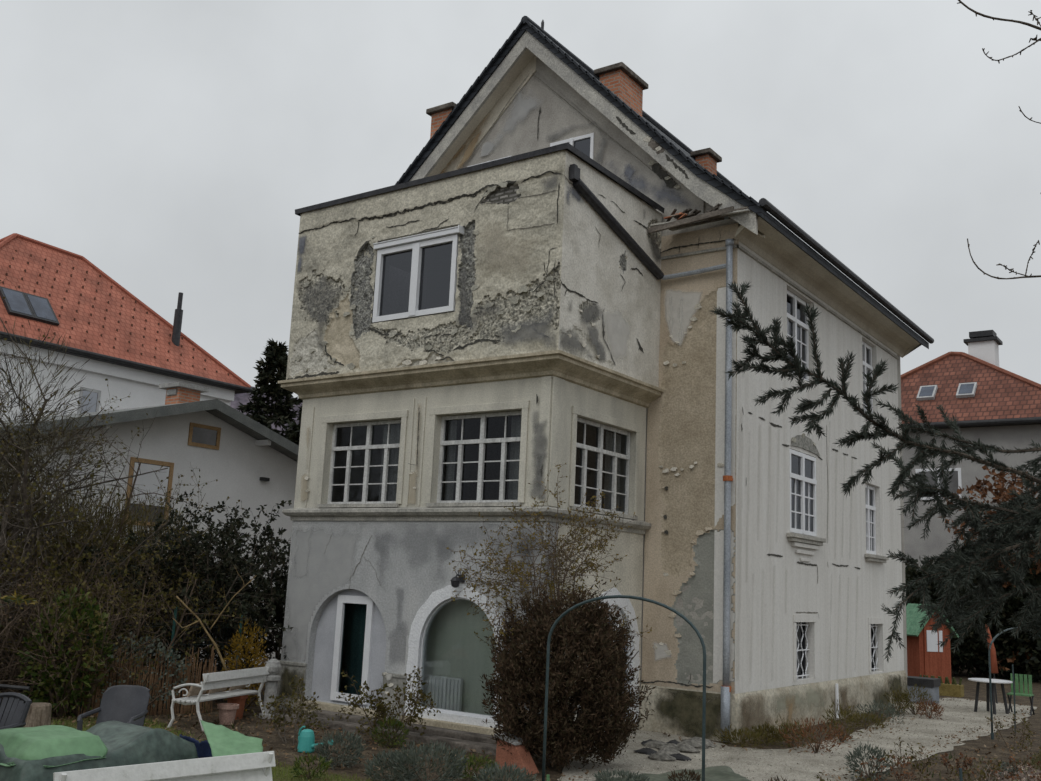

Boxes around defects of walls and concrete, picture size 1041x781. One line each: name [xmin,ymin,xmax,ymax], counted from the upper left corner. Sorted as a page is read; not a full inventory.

spalling [289,220,630,377]
crack [298,171,643,364]
spalling [480,181,522,205]
crack [468,73,675,189]
crack [660,235,734,253]
flaking render [652,283,737,686]